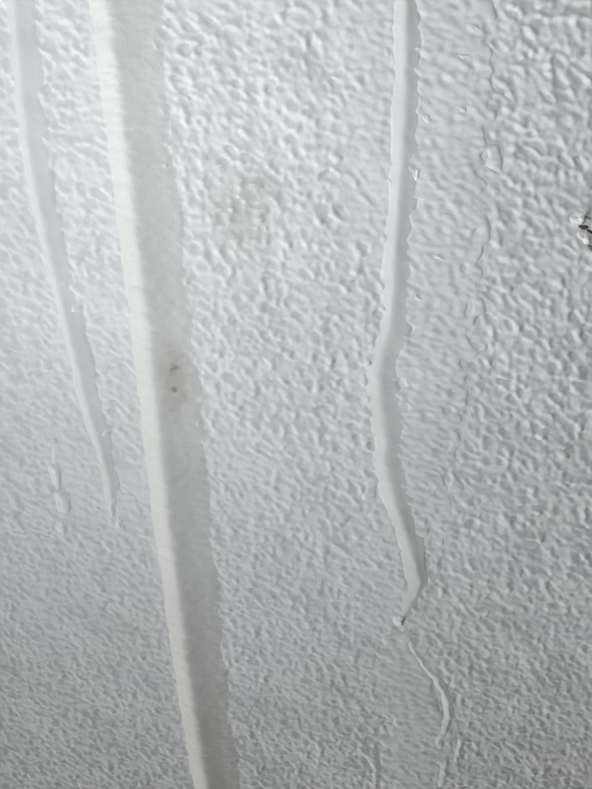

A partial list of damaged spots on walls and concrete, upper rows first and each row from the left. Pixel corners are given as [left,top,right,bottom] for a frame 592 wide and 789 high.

crack [6,0,125,531]
crack [365,0,464,787]
crack [357,747,381,788]